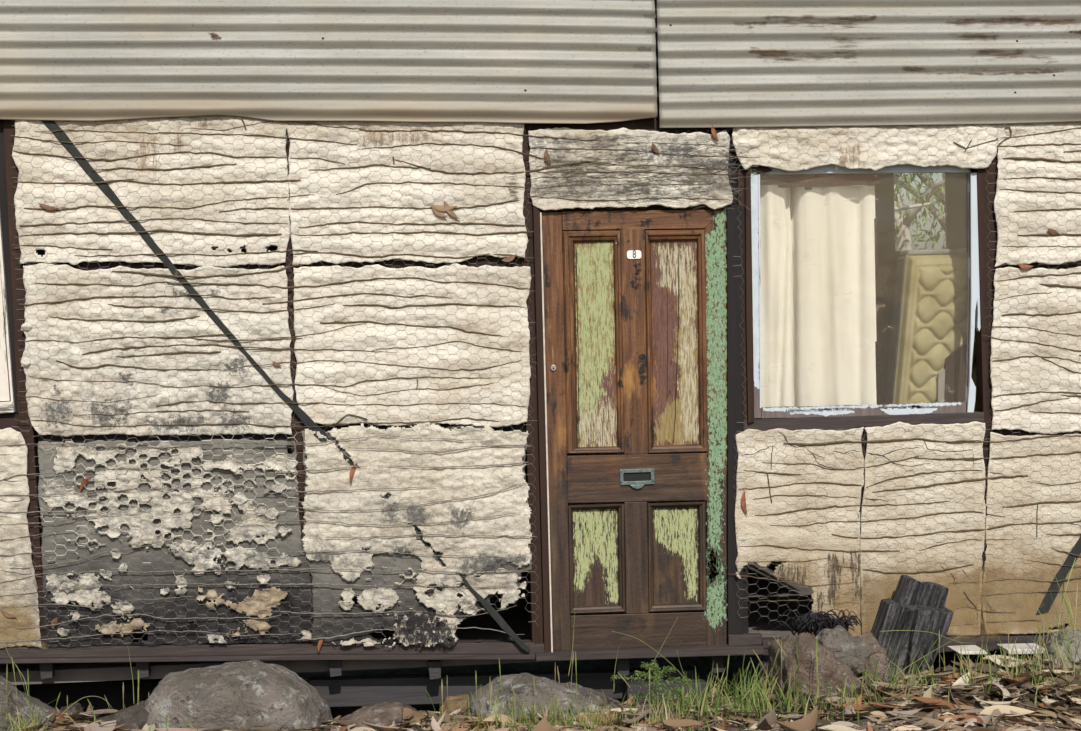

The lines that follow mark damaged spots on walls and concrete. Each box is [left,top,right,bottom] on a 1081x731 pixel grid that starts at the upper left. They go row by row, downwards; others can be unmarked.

corrosion [749,47,797,61]
corrosion [748,16,874,28]
corrosion [951,18,1081,75]
crack [284,129,292,225]
peeling [574,242,622,455]
mould [42,384,132,429]
mould [145,413,207,434]
mould [206,357,254,433]
peeling [41,422,532,647]
peeling [573,509,618,604]
crack [744,433,1003,633]